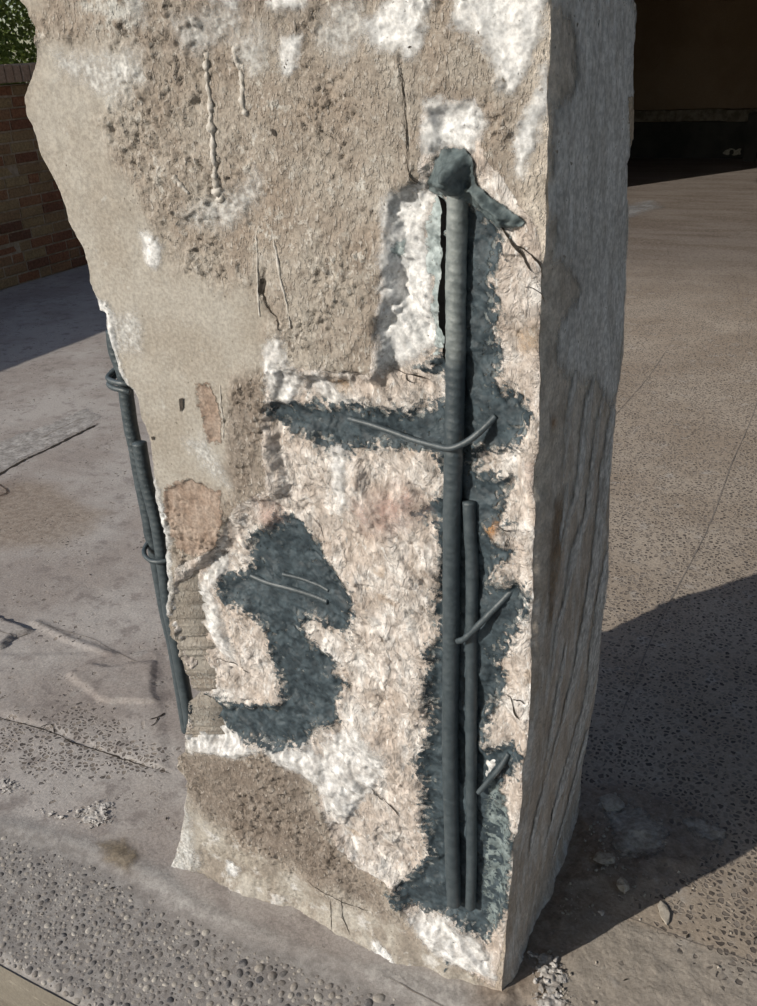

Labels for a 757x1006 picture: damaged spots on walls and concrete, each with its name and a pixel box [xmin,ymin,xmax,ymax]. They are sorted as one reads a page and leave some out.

crack [501,223,545,302]
crack [0,417,98,496]
spalling [98,0,636,988]